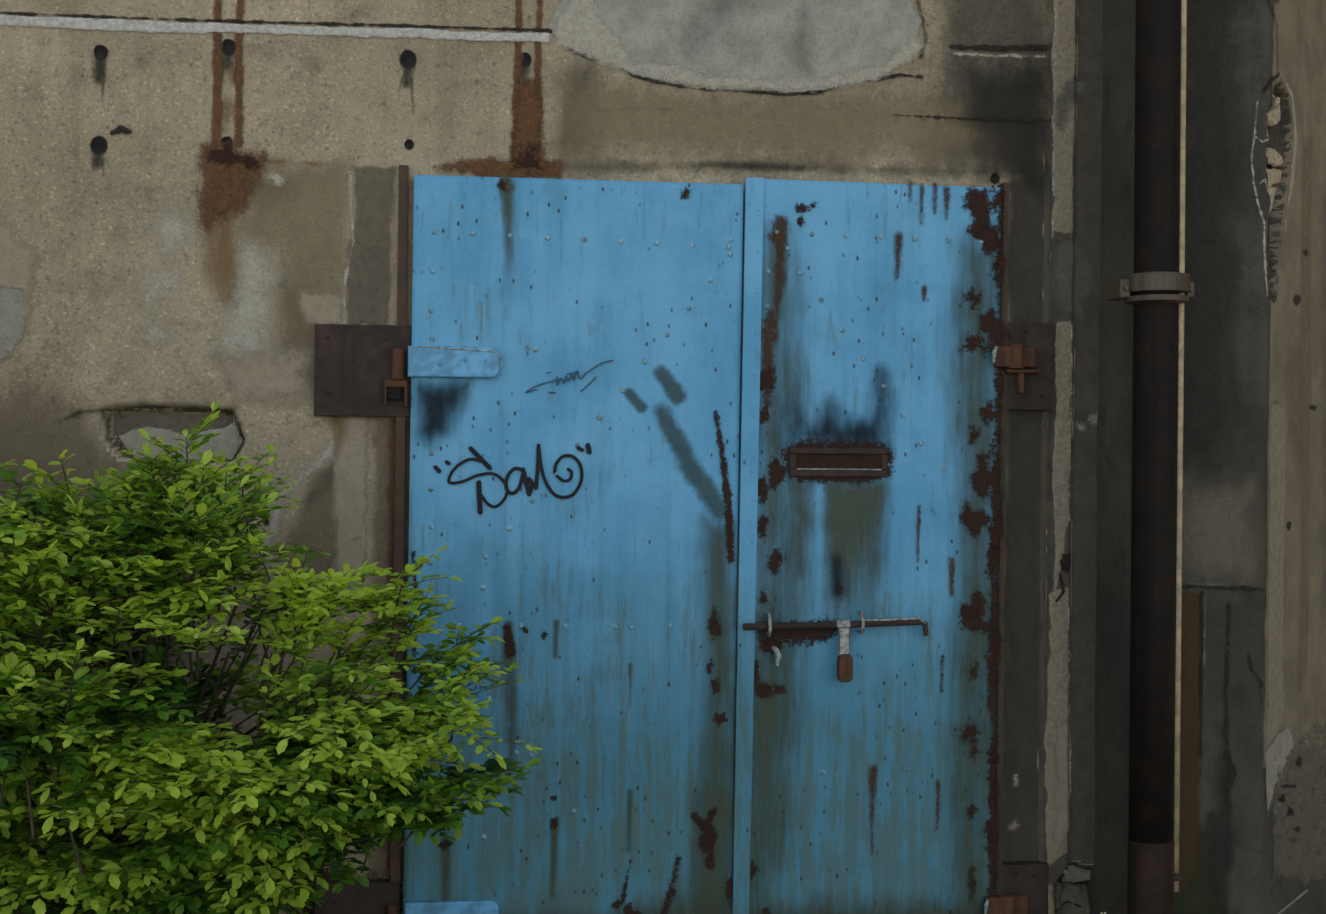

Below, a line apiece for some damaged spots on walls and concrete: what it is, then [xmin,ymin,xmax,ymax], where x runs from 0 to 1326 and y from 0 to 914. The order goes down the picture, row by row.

rust [198,0,282,290]
rust [434,0,564,247]
rust [759,200,816,425]
rust [894,232,903,279]
spalling [71,406,244,463]
rust [374,418,419,700]
rust [503,621,558,746]
rust [713,410,735,563]
rust [754,637,787,699]
rust [757,437,894,575]
rust [907,180,1008,909]
flaking render [1263,0,1326,885]